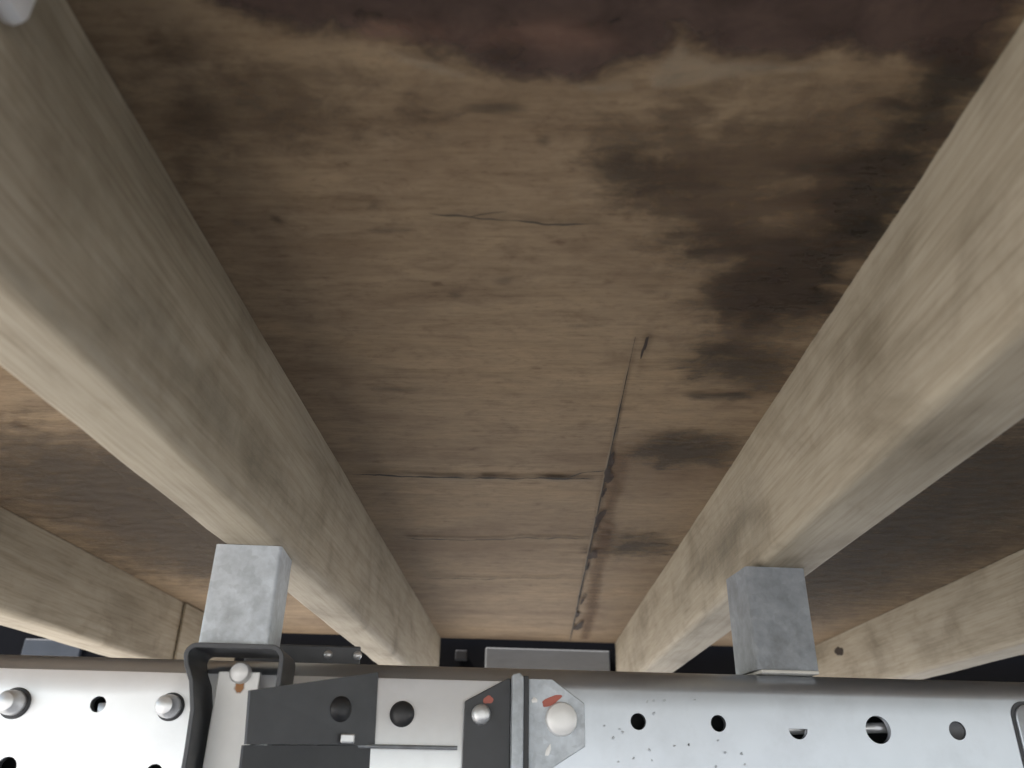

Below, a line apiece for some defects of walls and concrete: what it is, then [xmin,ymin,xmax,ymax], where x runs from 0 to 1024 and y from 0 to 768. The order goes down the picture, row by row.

crack [429,211,601,226]
damp [213,0,1024,329]
crack [359,336,649,641]